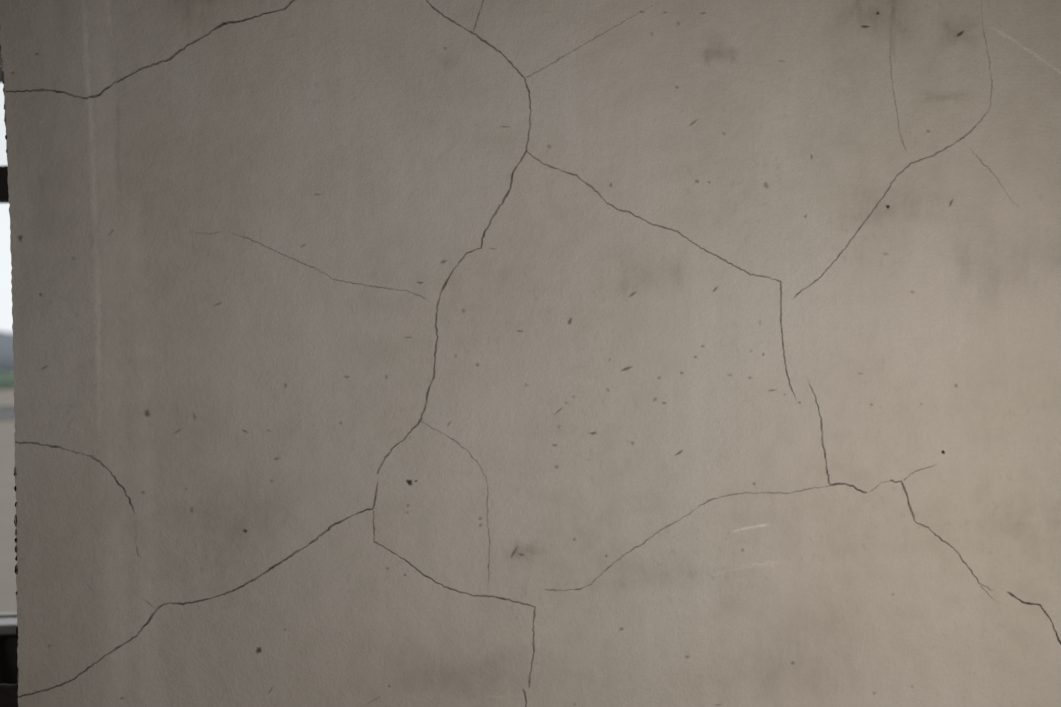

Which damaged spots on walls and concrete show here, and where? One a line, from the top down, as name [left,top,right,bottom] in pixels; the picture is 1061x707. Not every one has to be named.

crack [1010,593,1061,644]